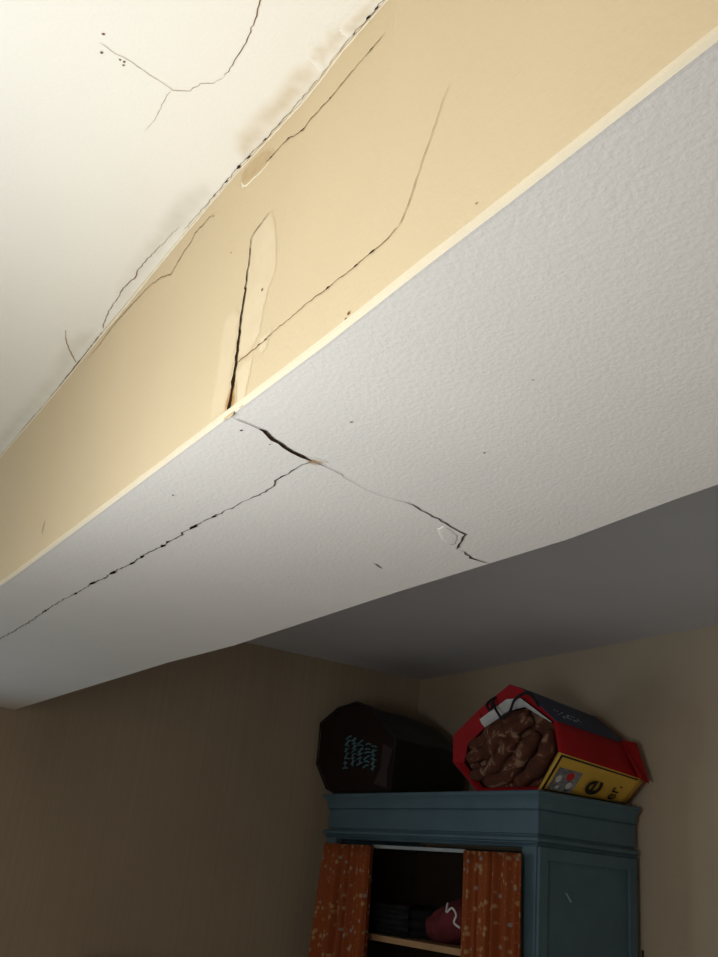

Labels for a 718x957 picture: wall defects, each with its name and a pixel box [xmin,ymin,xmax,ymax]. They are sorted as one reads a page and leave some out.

crack [3,0,384,452]
crack [2,85,490,638]